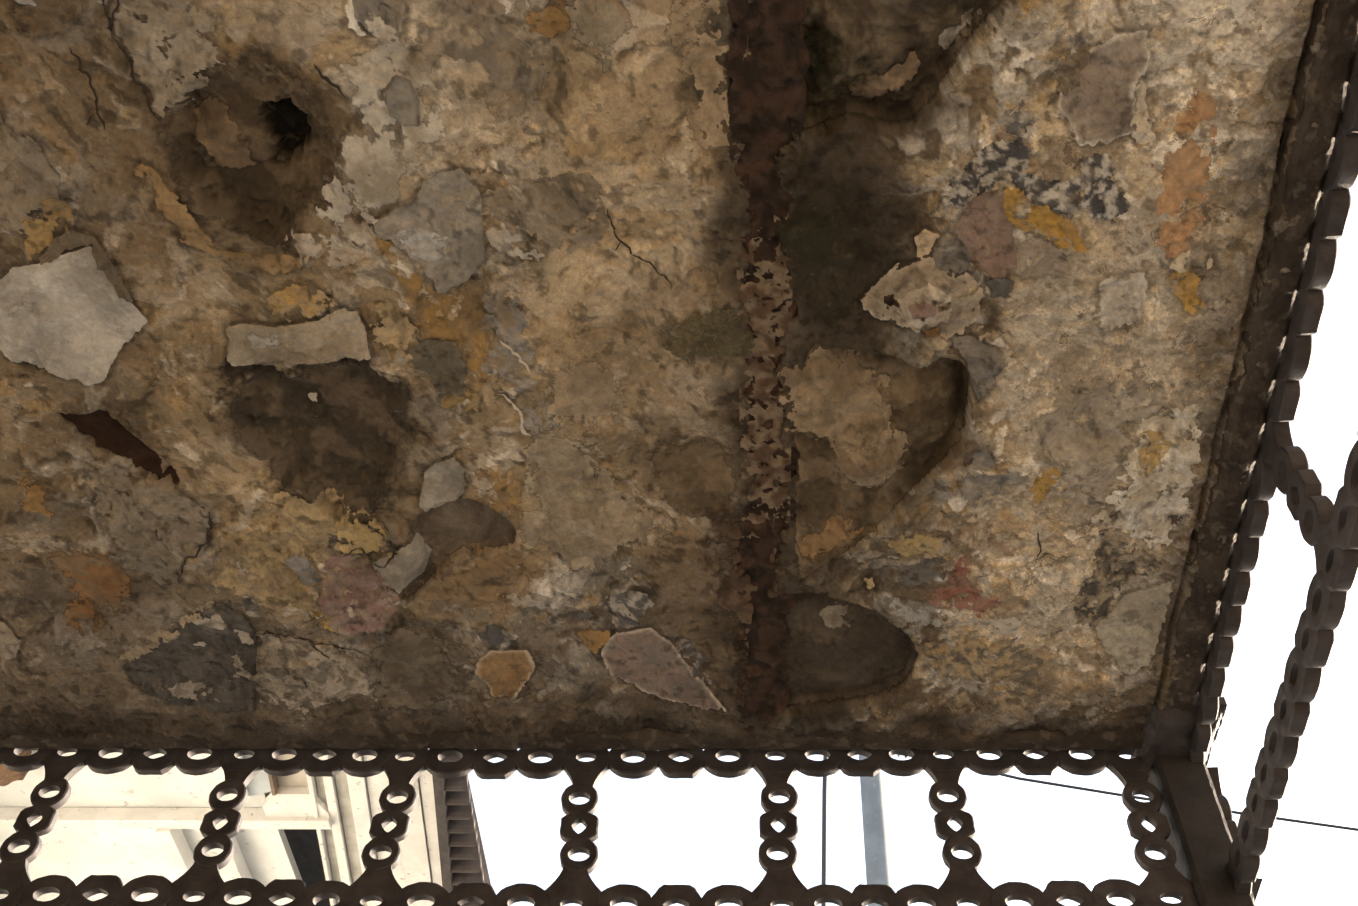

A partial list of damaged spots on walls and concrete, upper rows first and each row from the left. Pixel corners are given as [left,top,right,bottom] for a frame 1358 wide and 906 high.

crack [70,48,105,130]
crack [102,0,164,120]
peeling [22,198,75,265]
peeling [133,164,338,323]
peeling [369,168,560,444]
crack [607,209,672,287]
damp [985,277,1014,298]
hole [60,410,180,484]
spalling [118,357,535,726]
rust [696,507,791,694]